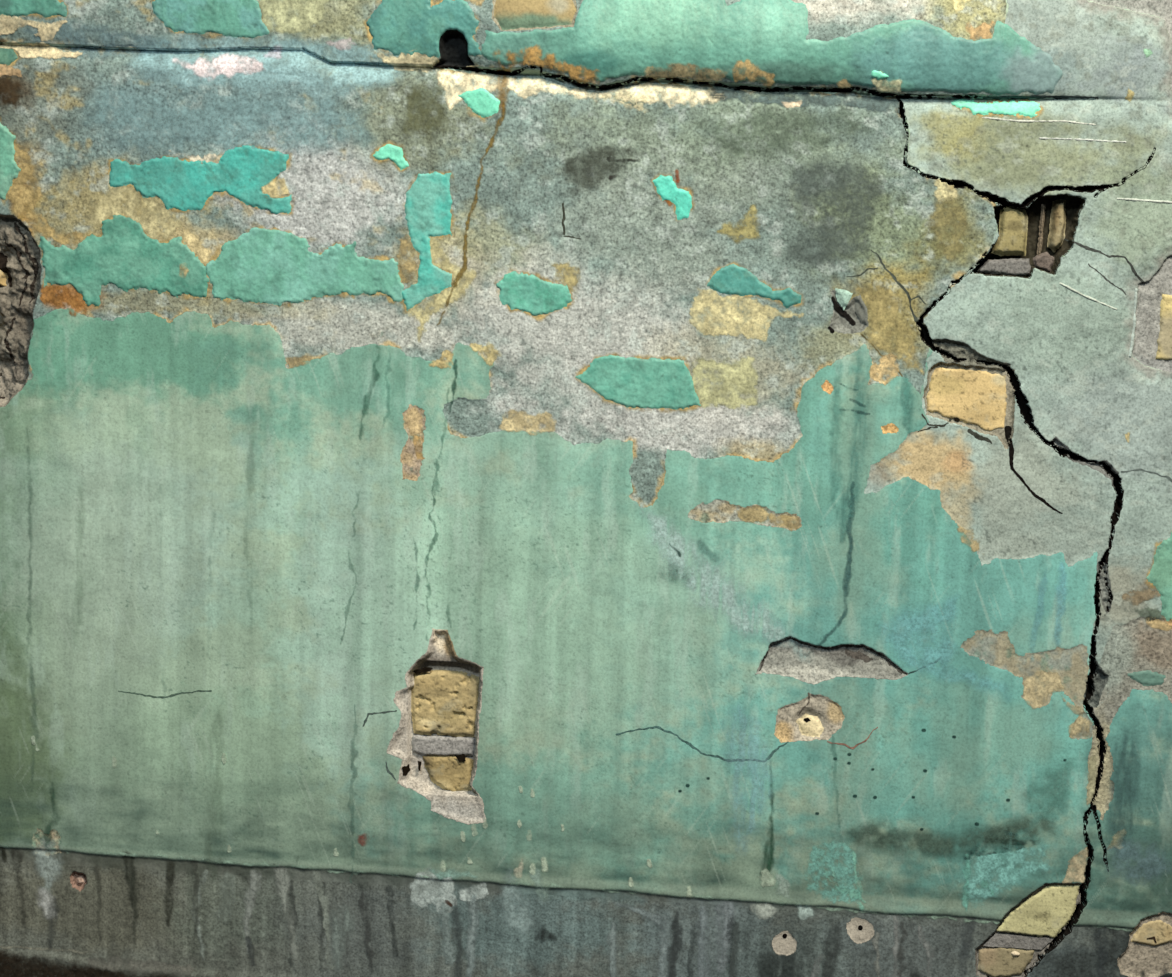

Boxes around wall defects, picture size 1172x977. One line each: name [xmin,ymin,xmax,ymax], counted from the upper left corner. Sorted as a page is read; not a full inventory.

corrosion [437,78,515,325]
peeling [0,0,1172,567]
crack [76,44,1156,209]
crack [846,238,1172,977]
peeling [922,243,1172,820]
spalling [387,628,486,825]
crack [616,726,788,762]
leakage [0,937,193,977]
leakage [155,845,364,969]
leakage [410,858,488,977]
leakage [756,820,813,919]
spalling [975,883,1083,977]